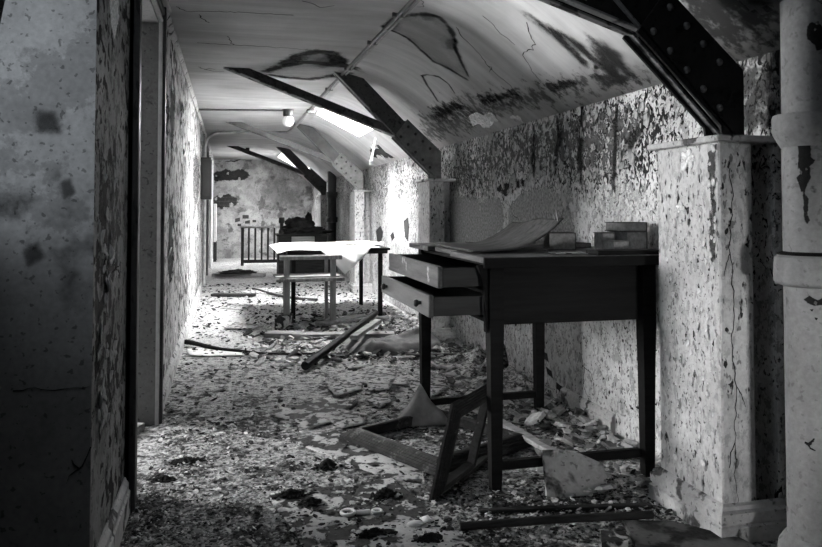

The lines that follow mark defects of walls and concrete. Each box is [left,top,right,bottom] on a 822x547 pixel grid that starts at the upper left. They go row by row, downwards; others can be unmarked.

peeling [166,74,199,209]
spalling [213,193,238,211]
spalling [213,167,250,181]
water stain [262,50,357,80]
water stain [381,12,468,80]
water stain [419,14,650,194]
peeling [446,93,651,242]
peeling [796,145,815,224]
peeling [807,21,822,50]
peeling [168,204,176,284]
crack [724,168,745,501]
peeling [804,296,822,320]